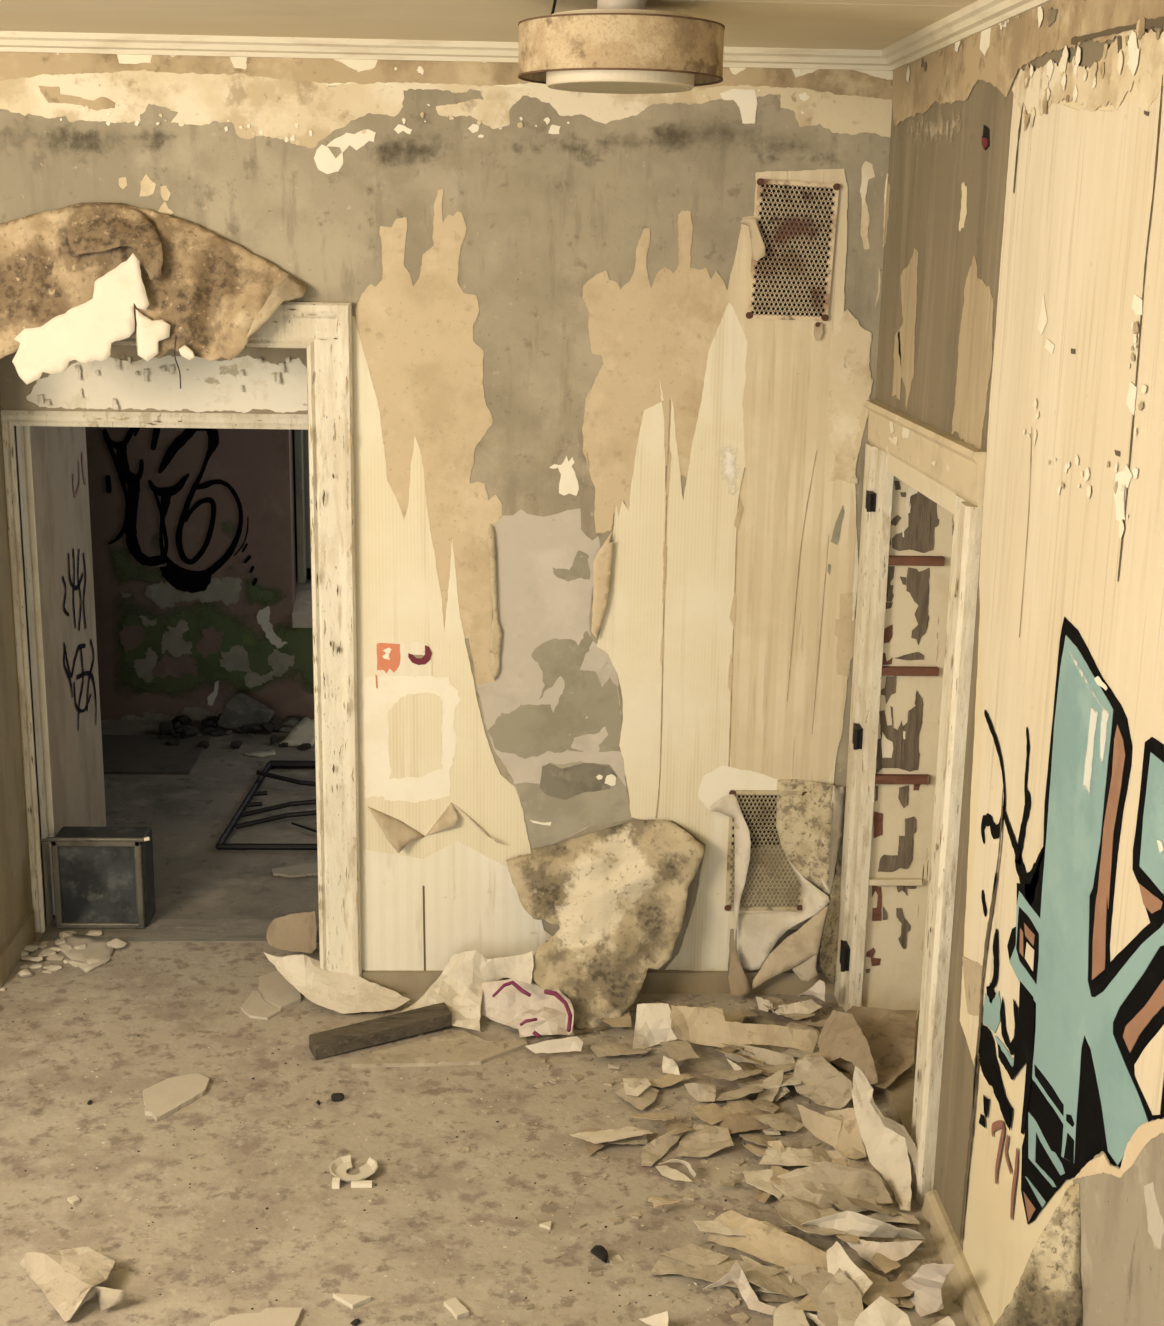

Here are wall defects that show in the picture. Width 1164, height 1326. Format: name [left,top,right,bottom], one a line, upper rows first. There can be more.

peeling [980,14,1020,56]
peeling [1012,17,1164,131]
peeling [119,175,174,215]
peeling [860,161,888,249]
peeling [26,355,312,442]
flaking render [827,309,873,484]
peeling [1107,460,1138,539]
peeling [119,576,294,689]
flaking render [477,455,626,826]
peeling [872,481,954,958]
peeling [706,779,846,996]
peeling [866,948,881,973]